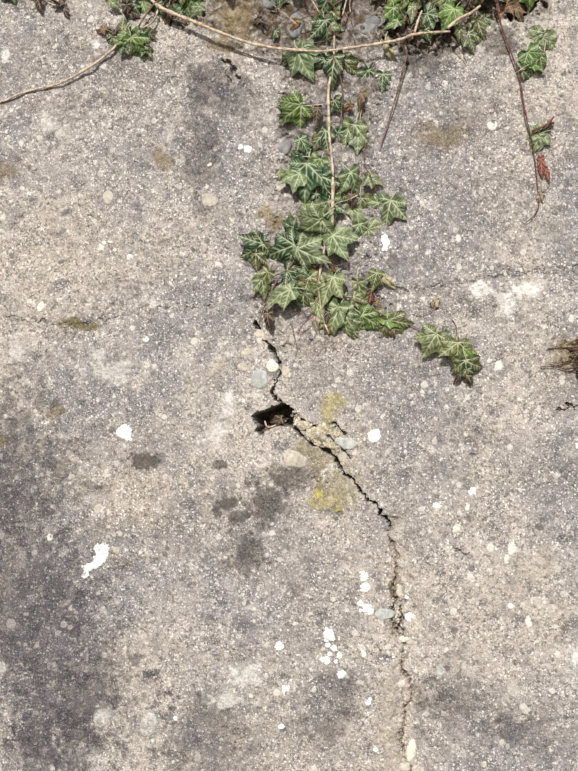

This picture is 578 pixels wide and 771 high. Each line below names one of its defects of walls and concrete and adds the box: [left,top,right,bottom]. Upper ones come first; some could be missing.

crack [144,295,262,313]
crack [0,305,120,326]
crack [253,319,414,771]